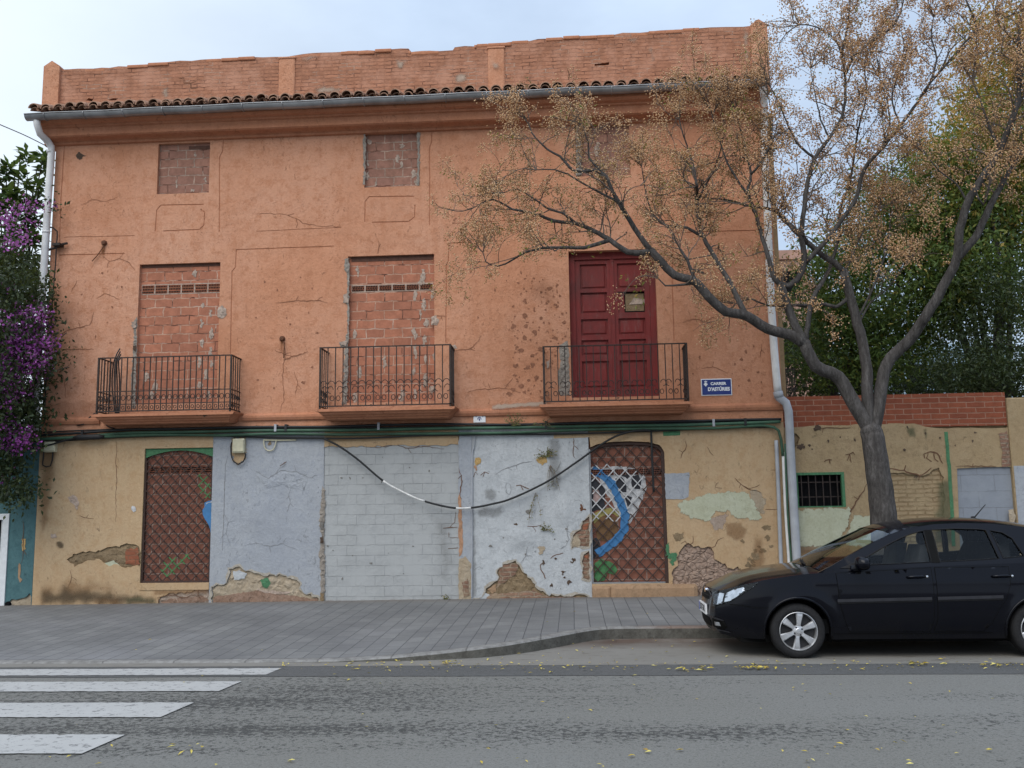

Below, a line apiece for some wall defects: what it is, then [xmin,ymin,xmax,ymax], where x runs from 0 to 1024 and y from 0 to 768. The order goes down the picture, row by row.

crack [275,341,308,411]
spalling [891,468,943,520]
spalling [68,543,141,568]
spalling [159,486,334,603]
spalling [458,494,593,599]
spalling [665,491,773,595]
spalling [905,533,918,551]
spalling [932,530,942,549]